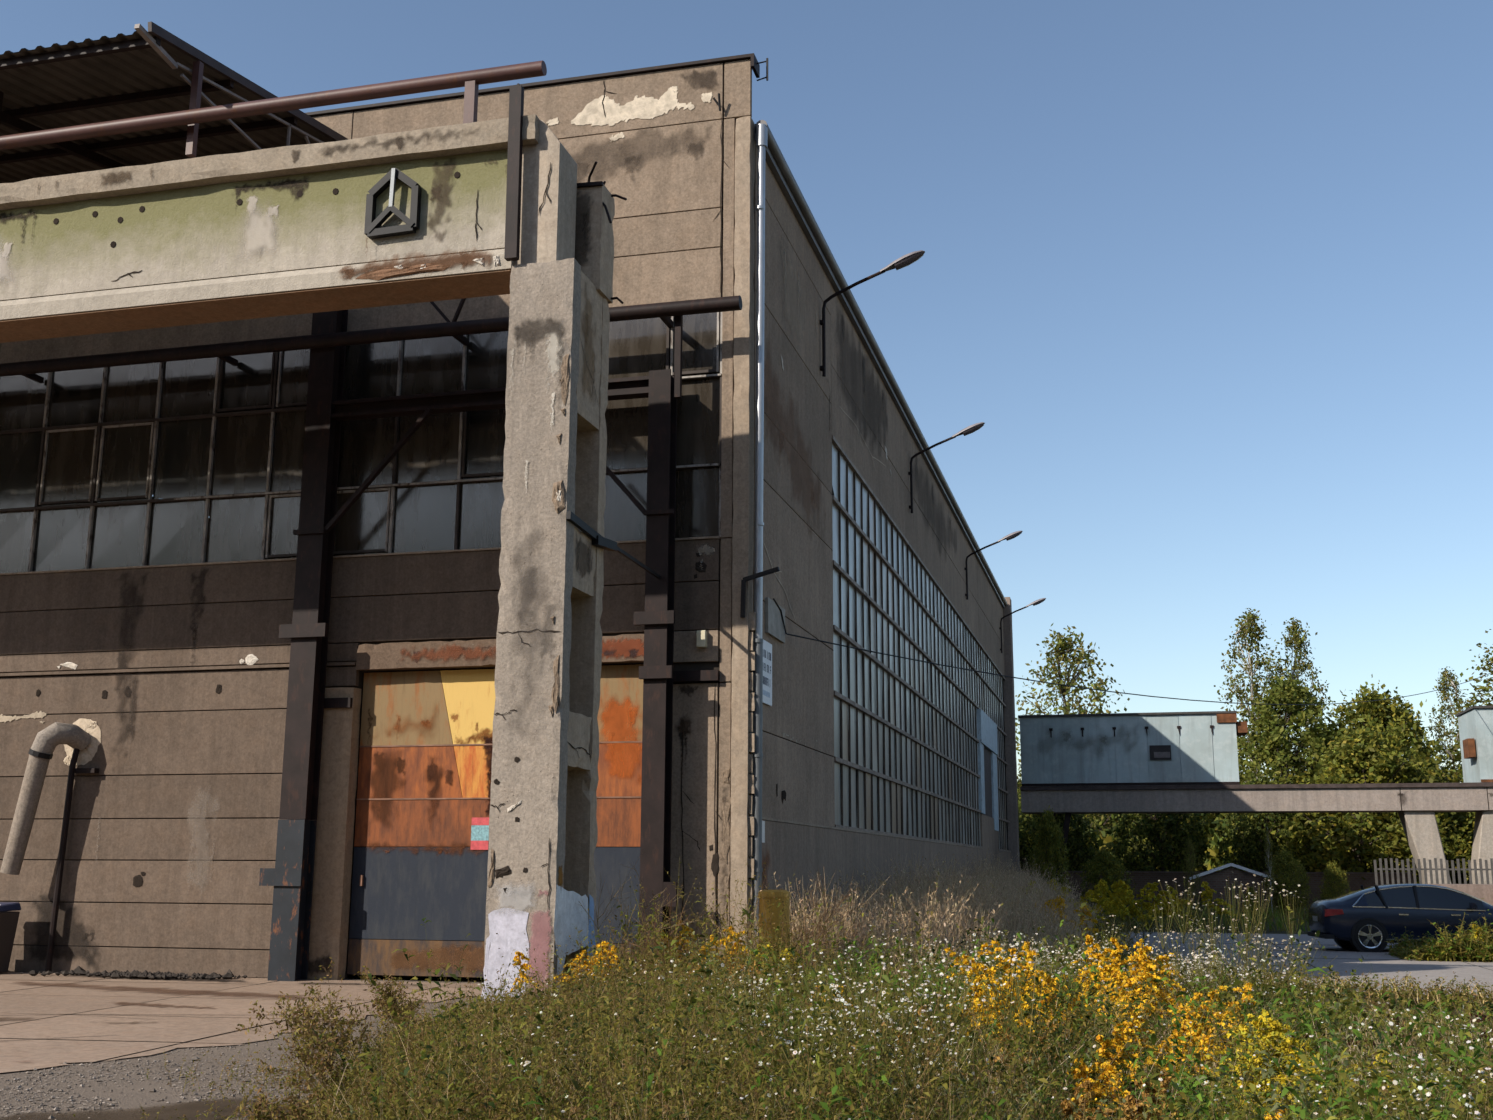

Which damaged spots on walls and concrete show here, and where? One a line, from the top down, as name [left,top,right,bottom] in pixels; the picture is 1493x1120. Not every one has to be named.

water stain [325,134,447,155]
peeling [547,86,712,141]
water stain [235,179,308,251]
water stain [428,163,455,240]
corrosion [340,238,491,279]
water stain [511,318,563,424]
water stain [117,577,145,735]
corrosion [371,753,405,821]
corrosion [427,760,452,810]
corrosion [458,723,493,814]
corrosion [601,698,642,777]
water stain [30,896,240,982]